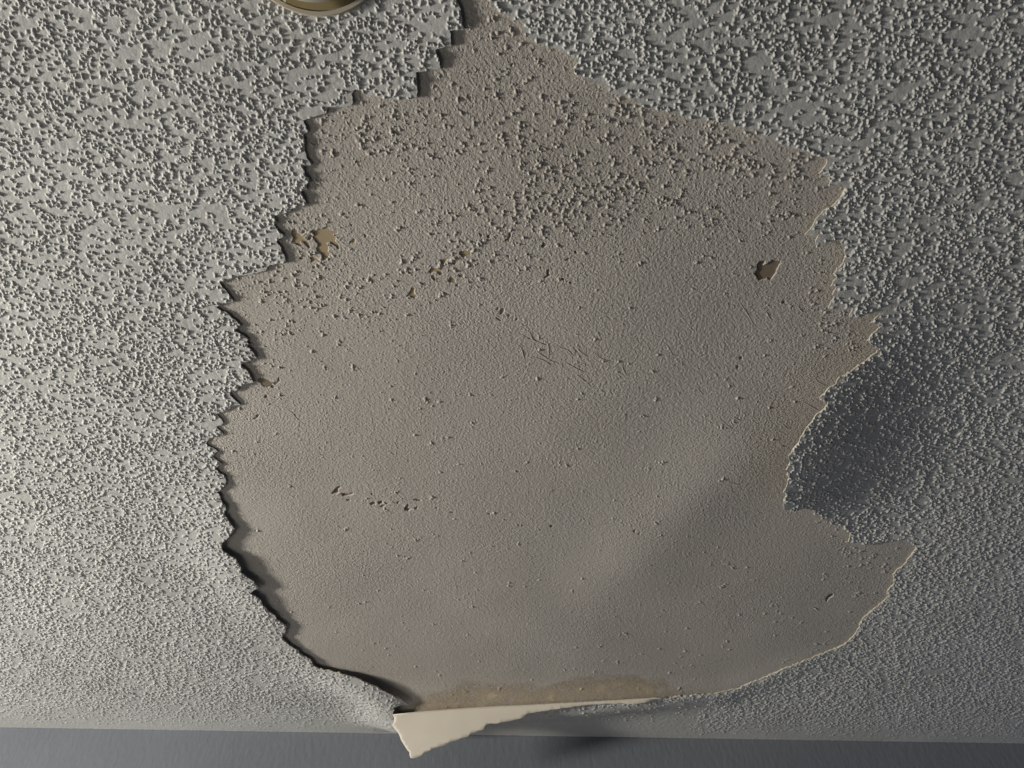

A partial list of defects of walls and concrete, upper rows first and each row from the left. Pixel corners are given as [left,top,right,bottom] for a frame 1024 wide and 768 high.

damp [416,679,669,711]
peeling [206,0,916,758]